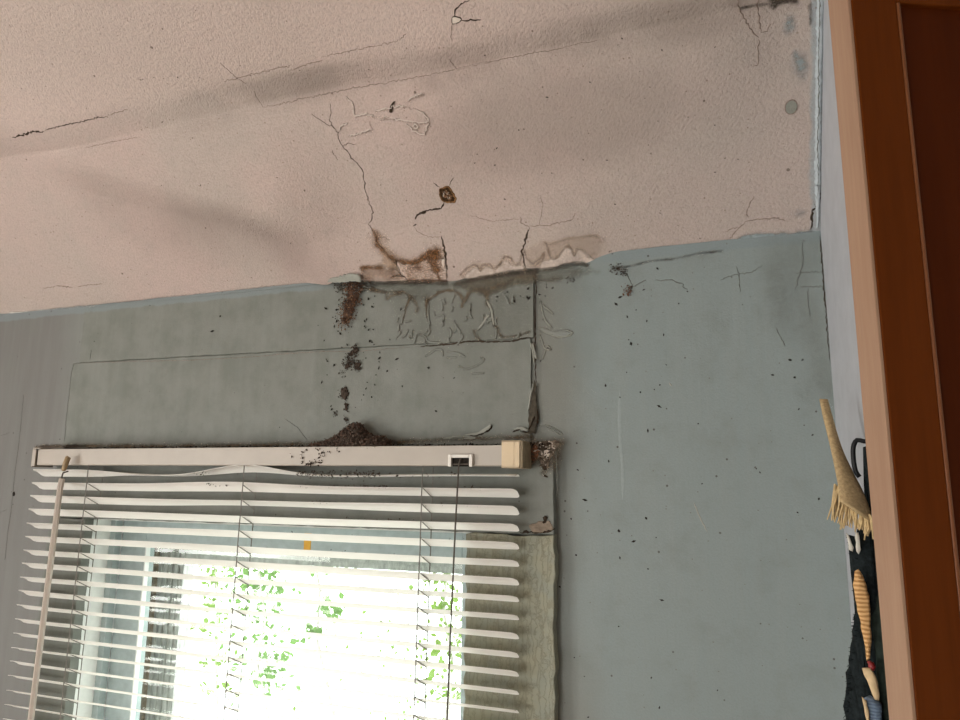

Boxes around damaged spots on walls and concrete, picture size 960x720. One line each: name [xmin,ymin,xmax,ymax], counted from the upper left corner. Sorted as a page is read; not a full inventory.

crack [12,109,127,138]
crack [224,34,596,266]
crack [64,200,575,441]
damp [363,246,594,319]